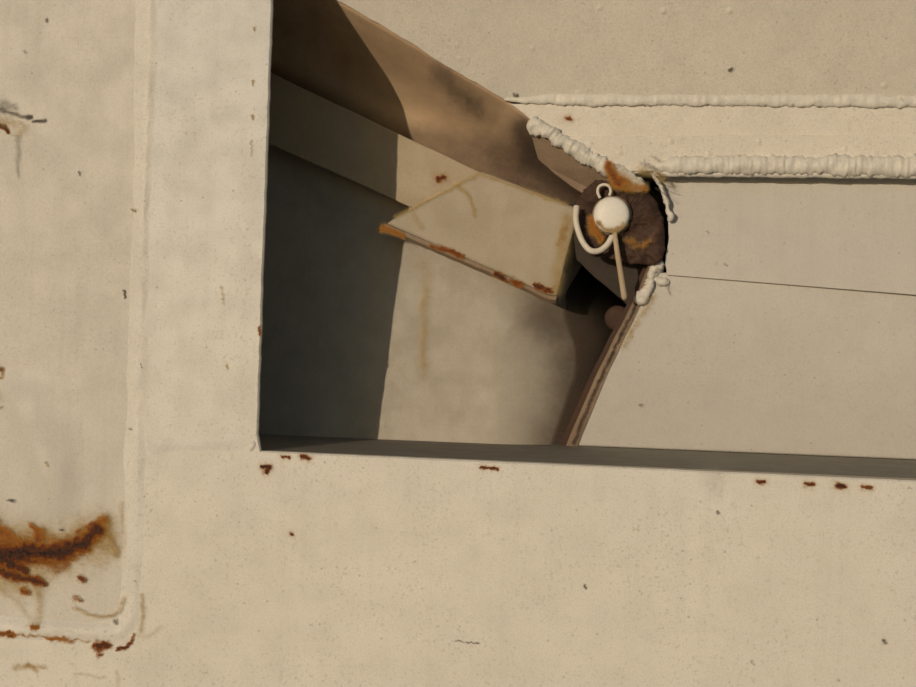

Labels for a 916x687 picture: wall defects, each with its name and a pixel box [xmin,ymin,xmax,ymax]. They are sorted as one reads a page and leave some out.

corrosion [604,161,648,192]
corrosion [378,225,404,239]
corrosion [588,216,625,244]
corrosion [430,244,464,259]
corrosion [493,271,557,293]
corrosion [0,516,119,596]
corrosion [0,624,76,643]
corrosion [91,633,134,657]